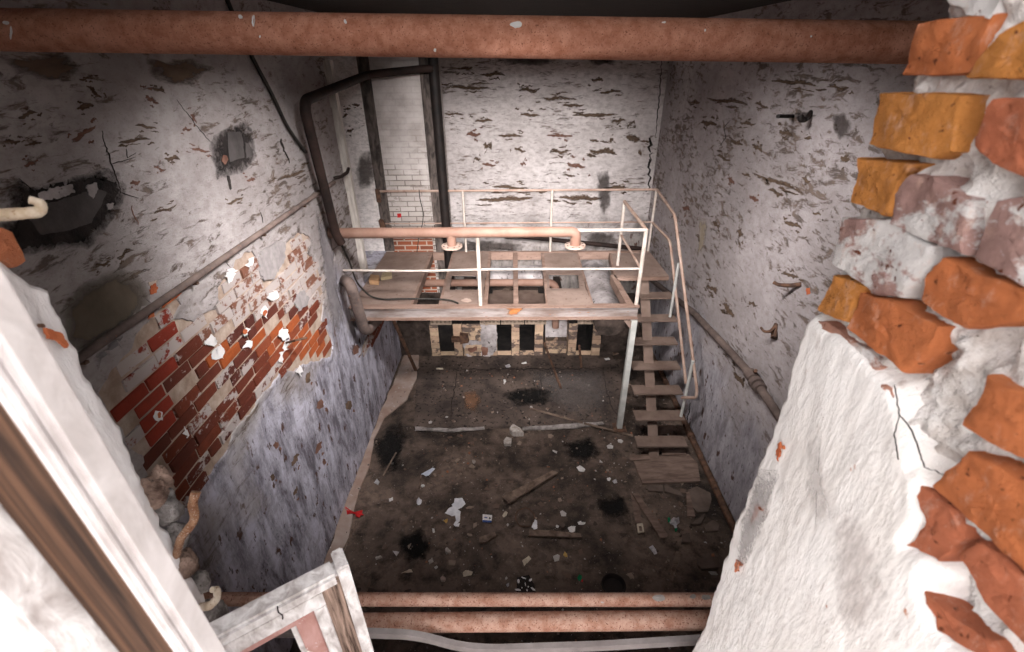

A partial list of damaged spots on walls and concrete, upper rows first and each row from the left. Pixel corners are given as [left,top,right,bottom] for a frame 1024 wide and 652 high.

peeling [442,65,505,93]
peeling [38,182,98,200]
crack [102,131,139,225]
peeling [445,111,527,169]
peeling [475,180,600,206]
peeling [515,82,649,179]
crack [646,61,662,192]
peeling [688,97,810,238]
flaking render [83,222,335,523]
flaking render [462,325,498,357]
flaking render [818,0,1024,652]
crack [893,385,944,475]